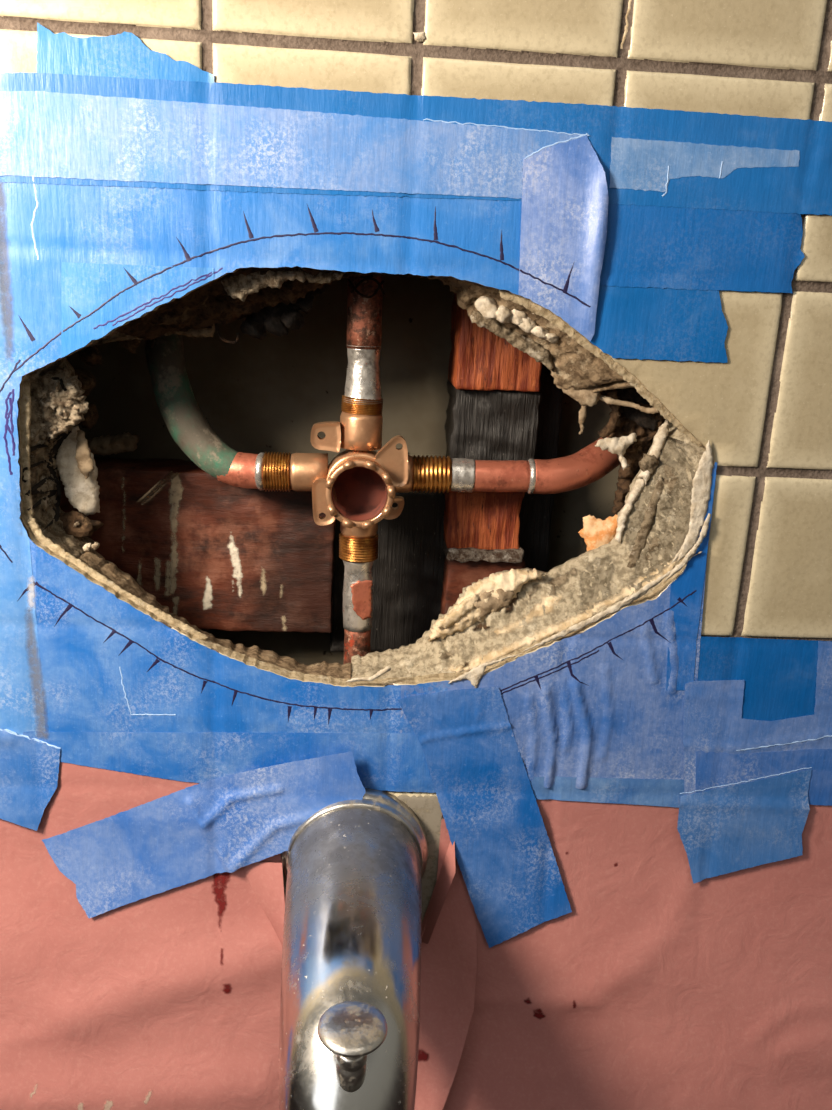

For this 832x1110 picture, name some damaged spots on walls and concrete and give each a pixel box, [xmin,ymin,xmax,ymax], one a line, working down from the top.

spalling [20,266,714,688]